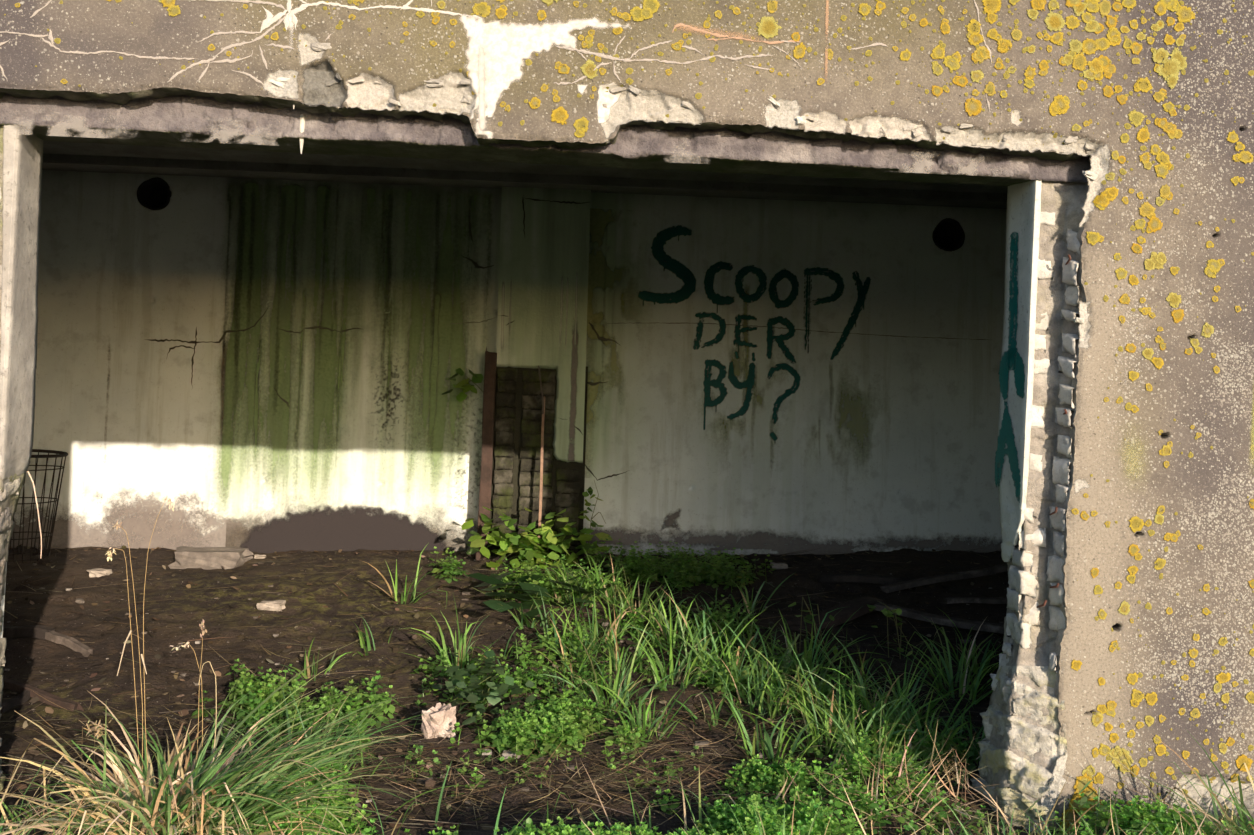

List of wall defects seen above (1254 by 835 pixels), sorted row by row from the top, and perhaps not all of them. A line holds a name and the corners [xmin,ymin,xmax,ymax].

crack [0,0,481,86]
spalling [263,33,475,115]
spalling [600,85,703,142]
water stain [219,181,491,497]
spalling [1032,752,1068,835]
spalling [1169,773,1254,826]